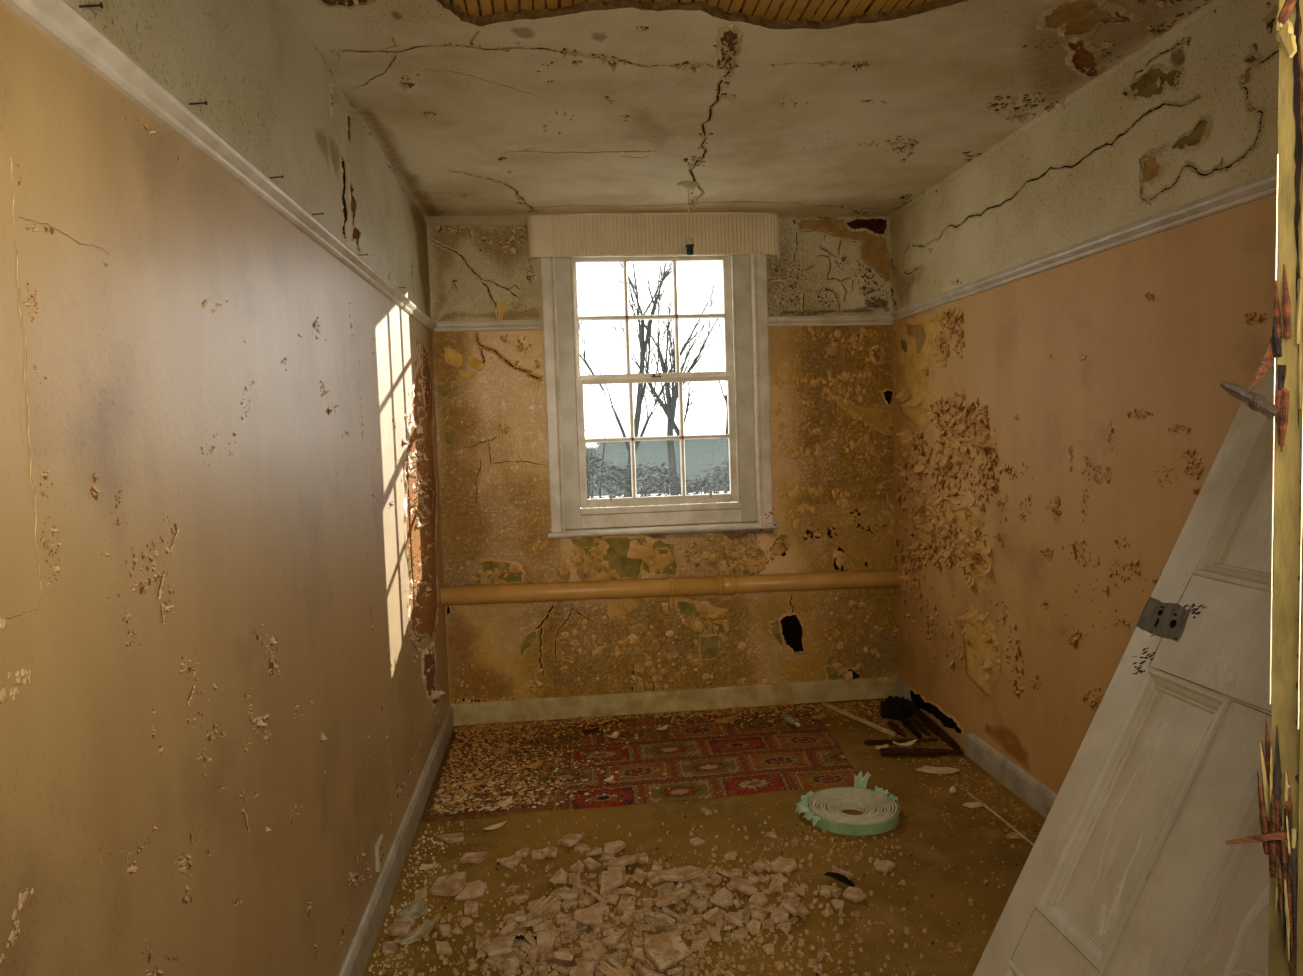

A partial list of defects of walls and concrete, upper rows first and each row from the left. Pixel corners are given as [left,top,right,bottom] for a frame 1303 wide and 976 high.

peeling [316,0,376,9]
peeling [1022,0,1217,79]
peeling [1122,63,1186,104]
peeling [1240,2,1278,116]
crack [315,30,1279,312]
peeling [1138,114,1213,205]
crack [0,157,106,620]
crack [428,226,543,382]
peeling [474,301,540,369]
peeling [556,189,1062,698]
peeling [108,515,180,652]
crack [1150,638,1272,713]